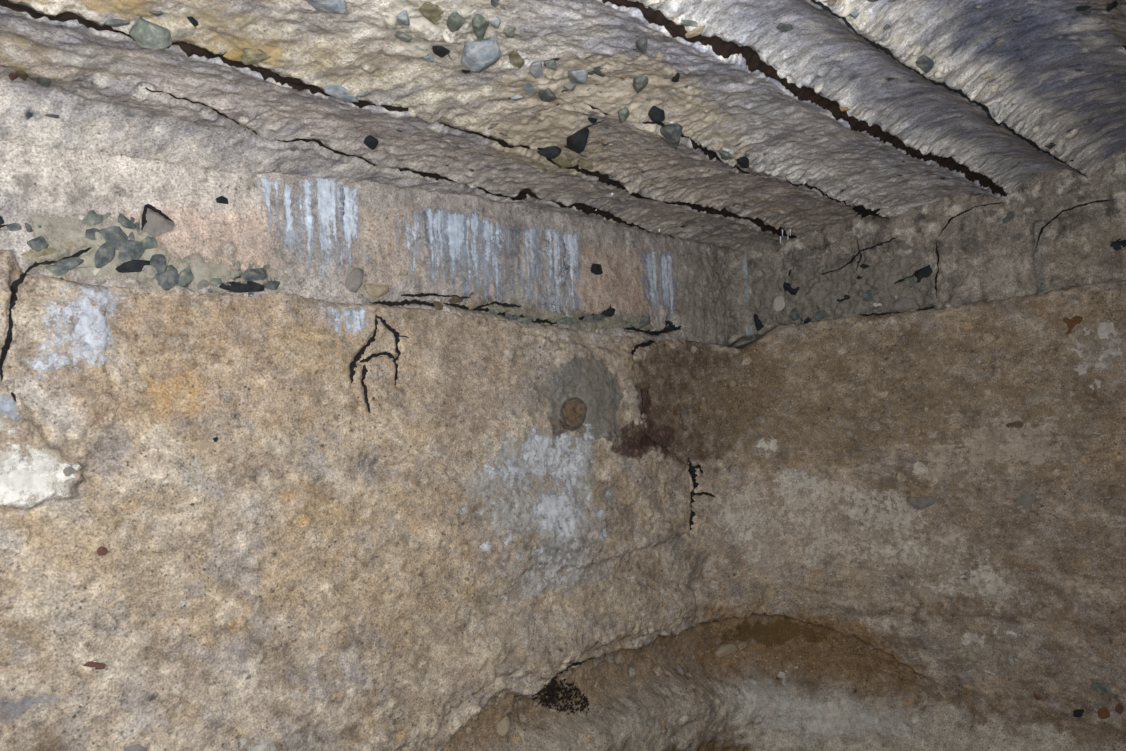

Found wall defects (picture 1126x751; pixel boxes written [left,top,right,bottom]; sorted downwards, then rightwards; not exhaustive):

crack [0,247,91,401]
crack [0,0,135,41]
crack [168,41,409,112]
efflorescence [256,173,368,278]
crack [141,87,797,249]
crack [350,293,595,413]
efflorescence [395,208,581,316]
efflorescence [640,249,679,326]
crack [602,0,1008,316]
crack [811,0,1126,252]
leakage [460,357,674,605]
crack [688,457,715,530]